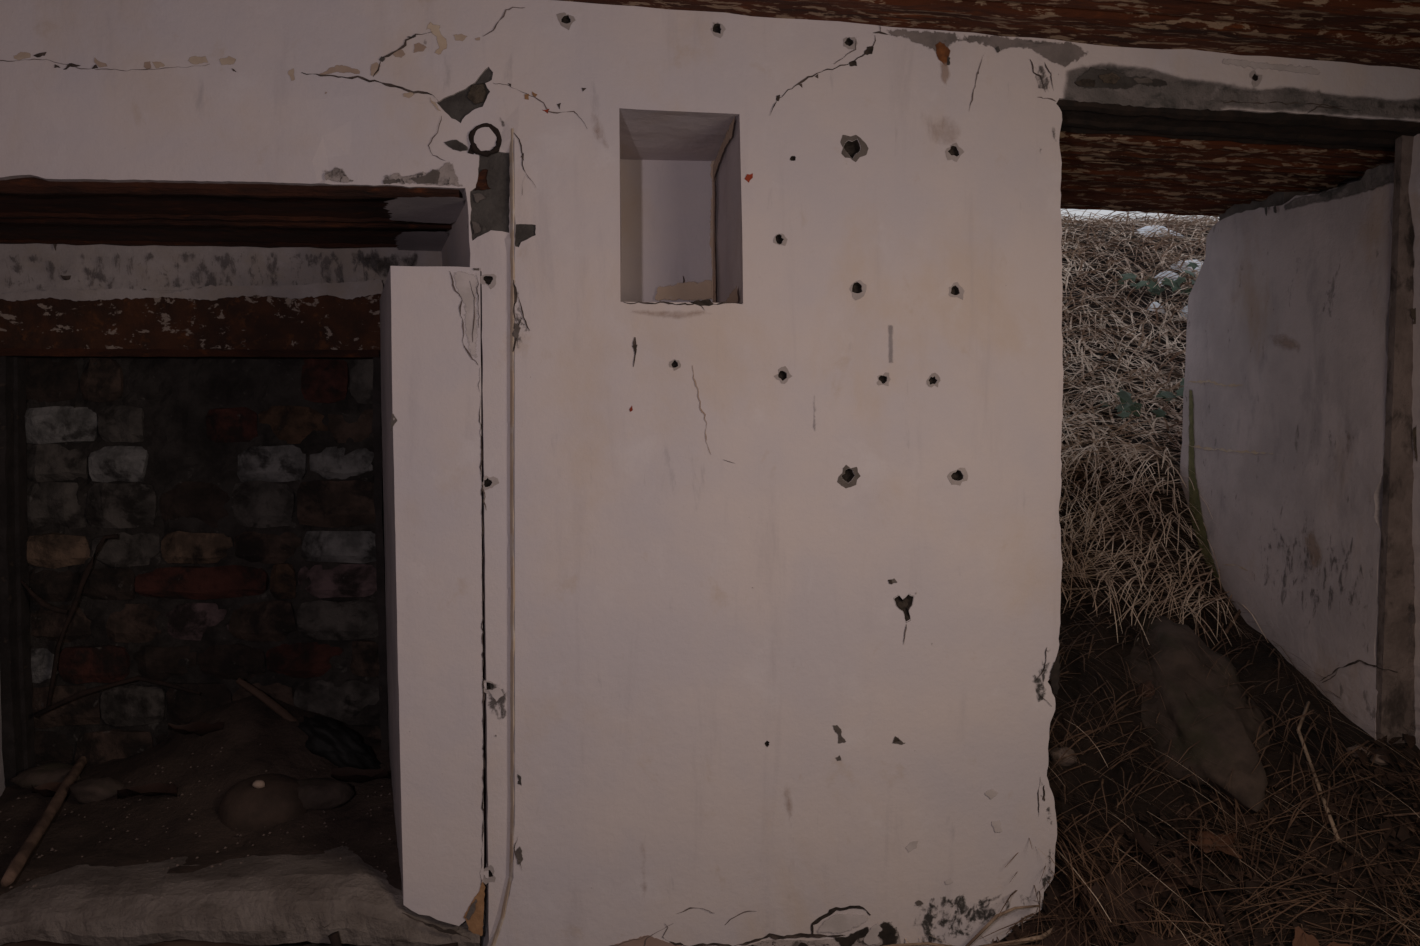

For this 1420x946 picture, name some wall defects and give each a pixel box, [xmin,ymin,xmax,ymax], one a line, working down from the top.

crack [288,7,525,111]
crack [771,28,889,112]
spalling [324,168,353,182]
peeling [383,68,536,946]
leakage [610,927,682,946]
peeling [748,914,901,946]